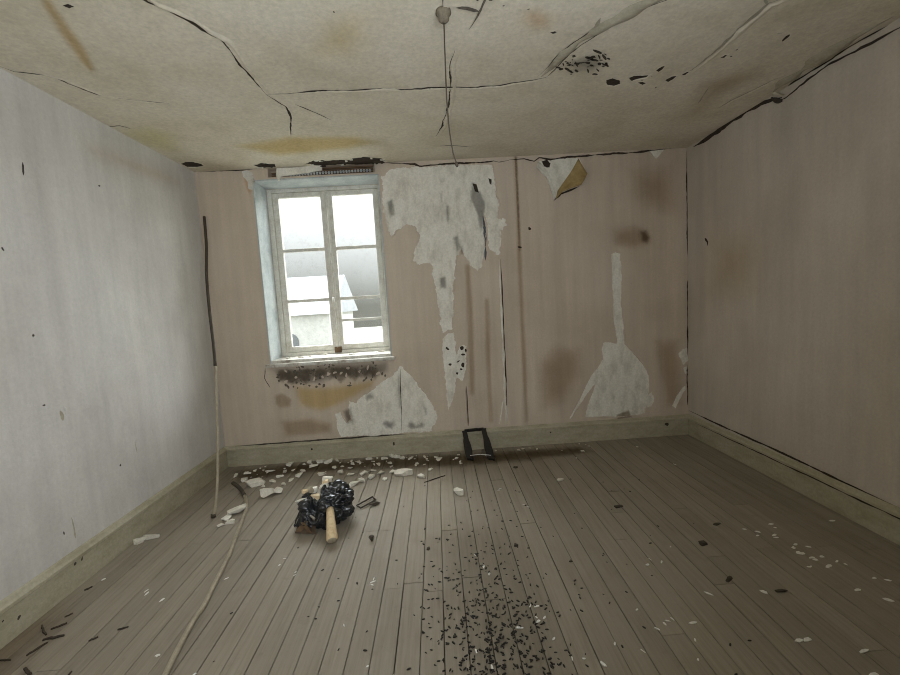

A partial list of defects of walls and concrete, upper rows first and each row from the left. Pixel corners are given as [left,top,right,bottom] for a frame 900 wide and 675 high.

crack [5,67,167,104]
crack [143,0,672,167]
water stain [556,50,610,75]
spalling [605,65,691,87]
flaking render [242,157,507,410]
water stain [276,361,386,389]
flaking render [335,365,437,446]
flaking render [569,252,654,420]